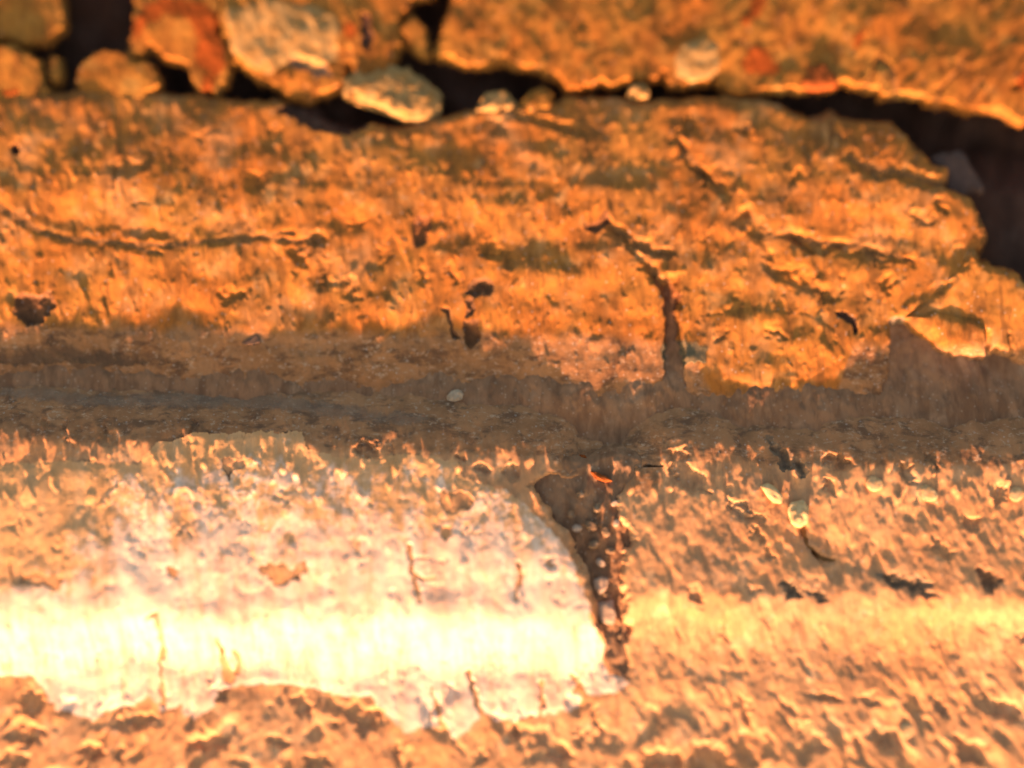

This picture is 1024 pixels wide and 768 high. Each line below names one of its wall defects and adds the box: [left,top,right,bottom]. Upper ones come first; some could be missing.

spalling [287,57,333,78]
spalling [626,83,650,102]
spalling [276,103,369,136]
spalling [475,87,581,139]
peeling [930,150,984,195]
spalling [412,214,433,249]
spalling [583,209,610,234]
spalling [731,203,773,240]
crack [608,220,668,298]